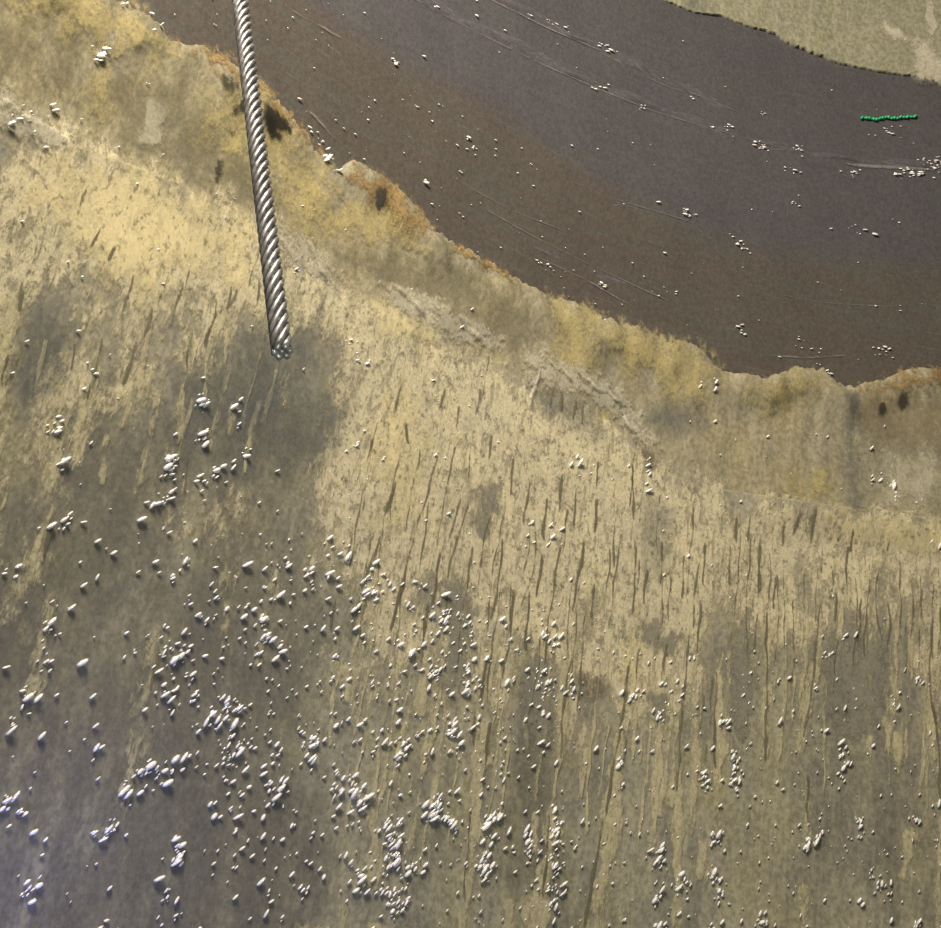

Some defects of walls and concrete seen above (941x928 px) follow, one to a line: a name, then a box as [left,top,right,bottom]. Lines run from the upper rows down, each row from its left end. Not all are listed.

spalling [264,103,292,139]
rust [257,81,325,153]
spalling [375,187,388,210]
rust [345,161,436,237]
peeling [277,218,340,284]
damp [0,0,290,624]
peeling [378,280,505,350]
damp [261,88,941,928]
damp [24,594,55,707]
damp [131,626,160,716]
damp [118,731,147,810]